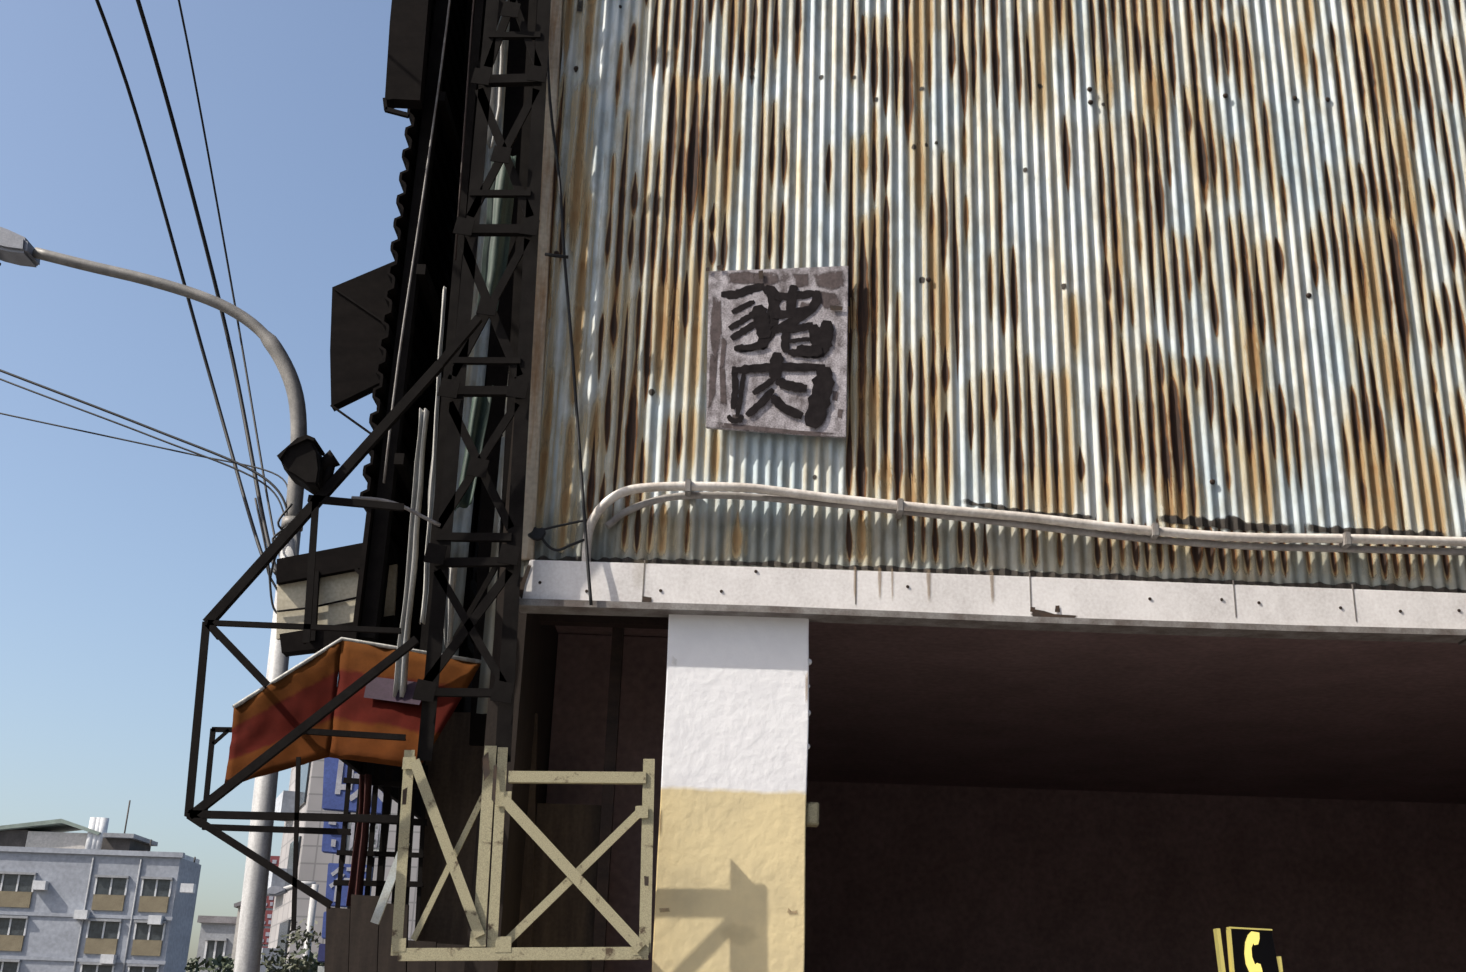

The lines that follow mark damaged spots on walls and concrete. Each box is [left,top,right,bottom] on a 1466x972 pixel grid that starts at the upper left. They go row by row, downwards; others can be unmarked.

rust [536,0,801,558]
rust [826,0,1302,599]
rust [1296,0,1466,580]